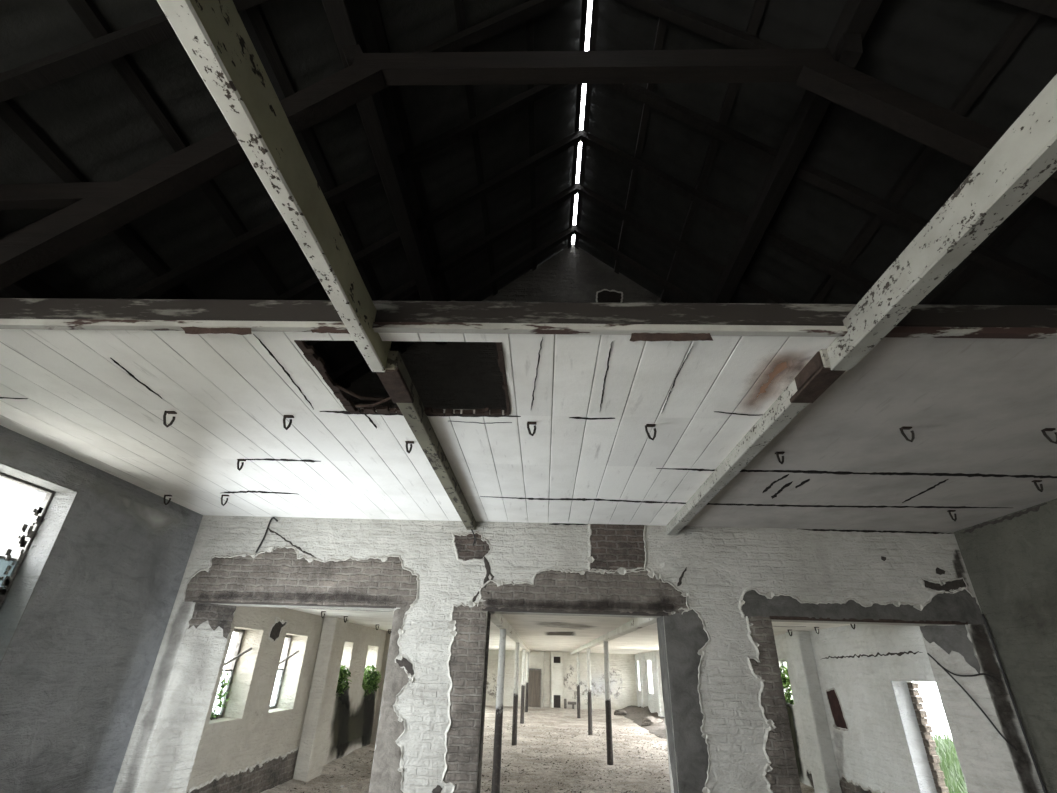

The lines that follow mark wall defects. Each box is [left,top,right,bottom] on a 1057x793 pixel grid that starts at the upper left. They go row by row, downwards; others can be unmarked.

peeling [181,327,252,335]
crack [111,358,162,398]
spalling [294,329,402,414]
crack [254,335,543,429]
spalling [424,342,511,417]
rust [749,357,800,405]
crack [656,465,715,473]
crack [480,469,1057,534]
crack [268,528,316,558]
spalling [183,545,420,793]
spalling [432,524,711,793]
spalling [739,567,985,793]